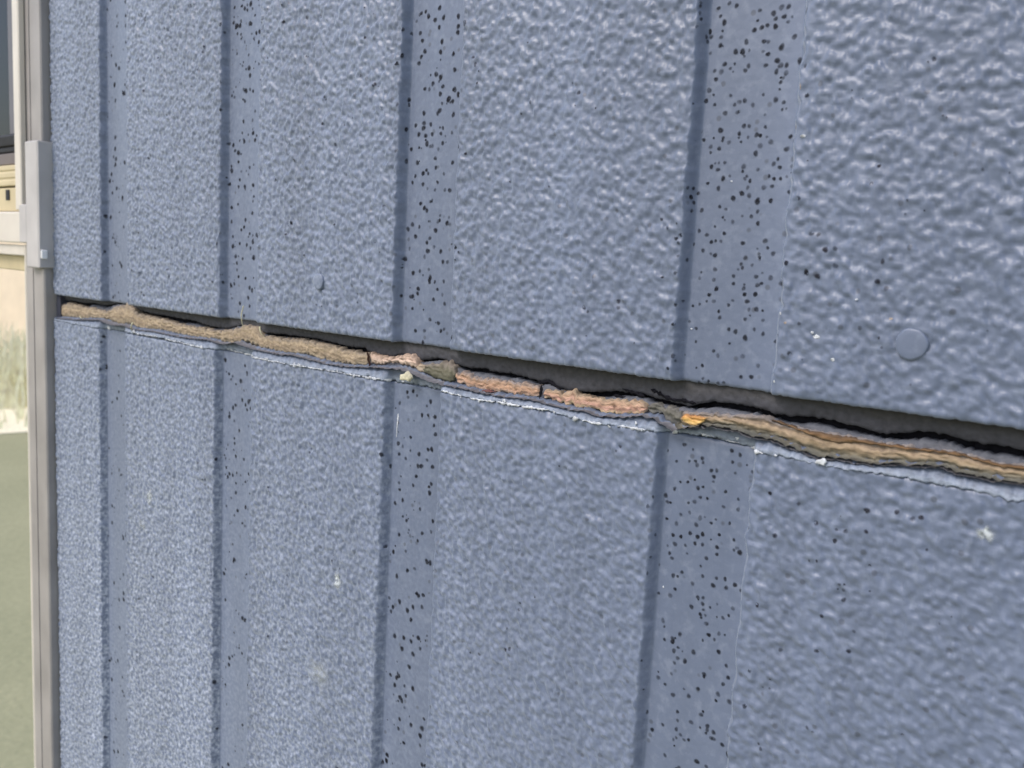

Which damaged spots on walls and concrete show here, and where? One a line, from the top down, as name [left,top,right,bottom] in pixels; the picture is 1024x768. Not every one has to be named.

crack [71,301,226,329]
crack [270,333,371,366]
crack [426,358,1024,456]